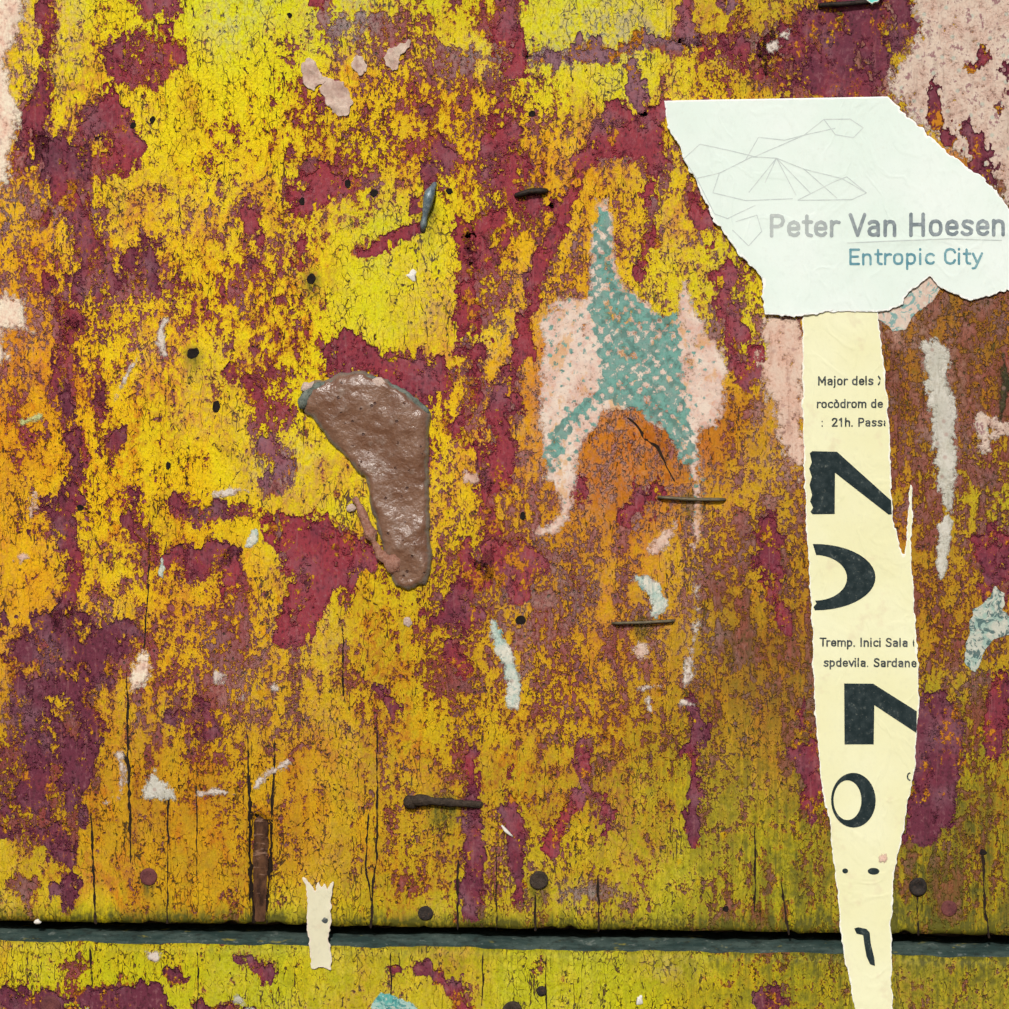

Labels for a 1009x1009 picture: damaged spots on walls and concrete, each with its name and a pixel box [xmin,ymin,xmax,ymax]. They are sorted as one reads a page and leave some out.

peeling [925,74,1001,187]
peeling [962,43,1009,117]
peeling [321,0,922,682]
peeling [0,0,197,916]
crack [627,417,675,482]
crack [89,815,97,924]
crack [123,672,132,863]
crack [164,799,172,924]
crack [246,735,276,923]
peeling [781,691,828,826]
peeling [901,665,1009,848]
crack [87,948,95,987]